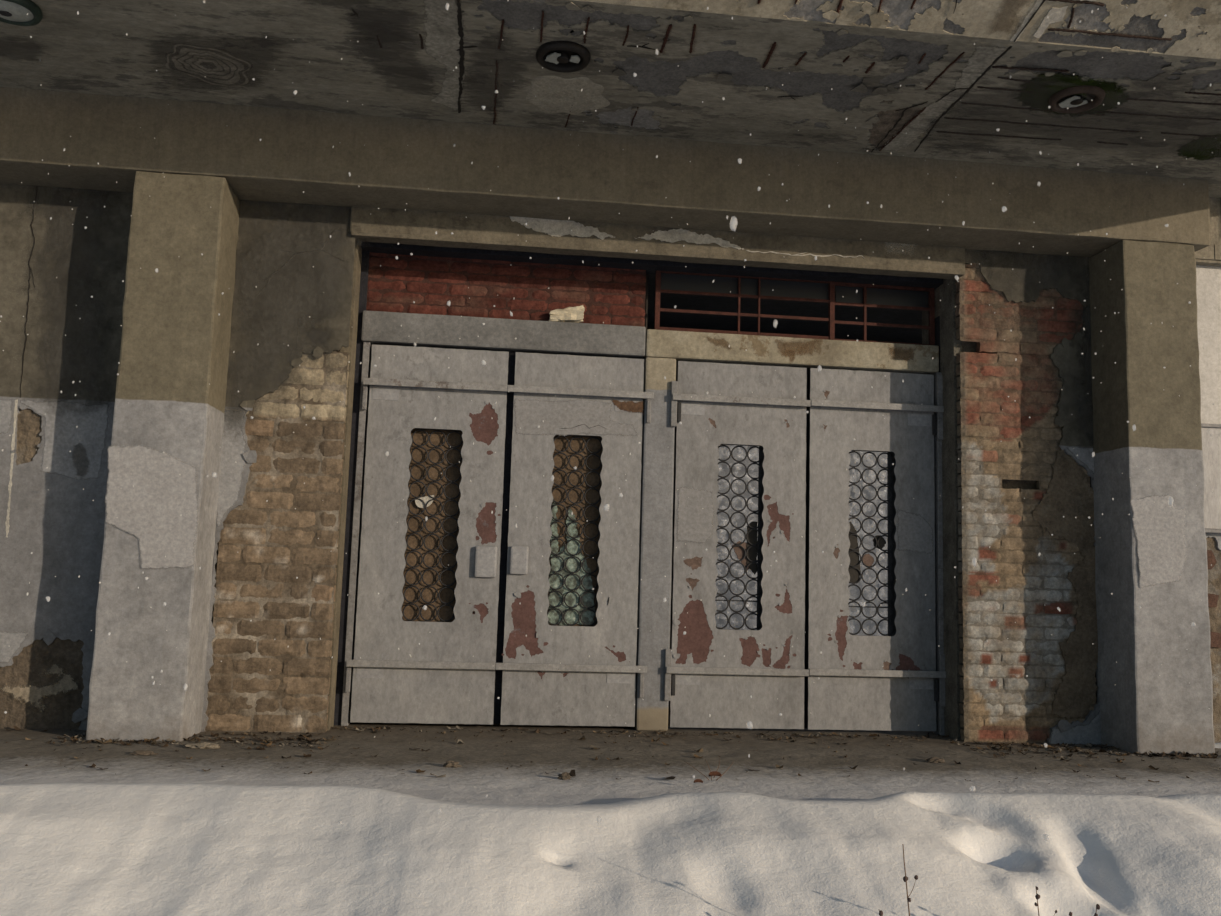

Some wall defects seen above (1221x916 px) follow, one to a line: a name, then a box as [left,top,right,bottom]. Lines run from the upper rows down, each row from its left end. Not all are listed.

peeling [462,0,967,151]
peeling [997,0,1221,92]
peeling [510,216,615,240]
peeling [635,228,744,250]
flaking render [205,346,349,733]
flaking render [955,263,1098,743]
flaking render [0,631,88,729]
flaking render [1206,537,1221,743]